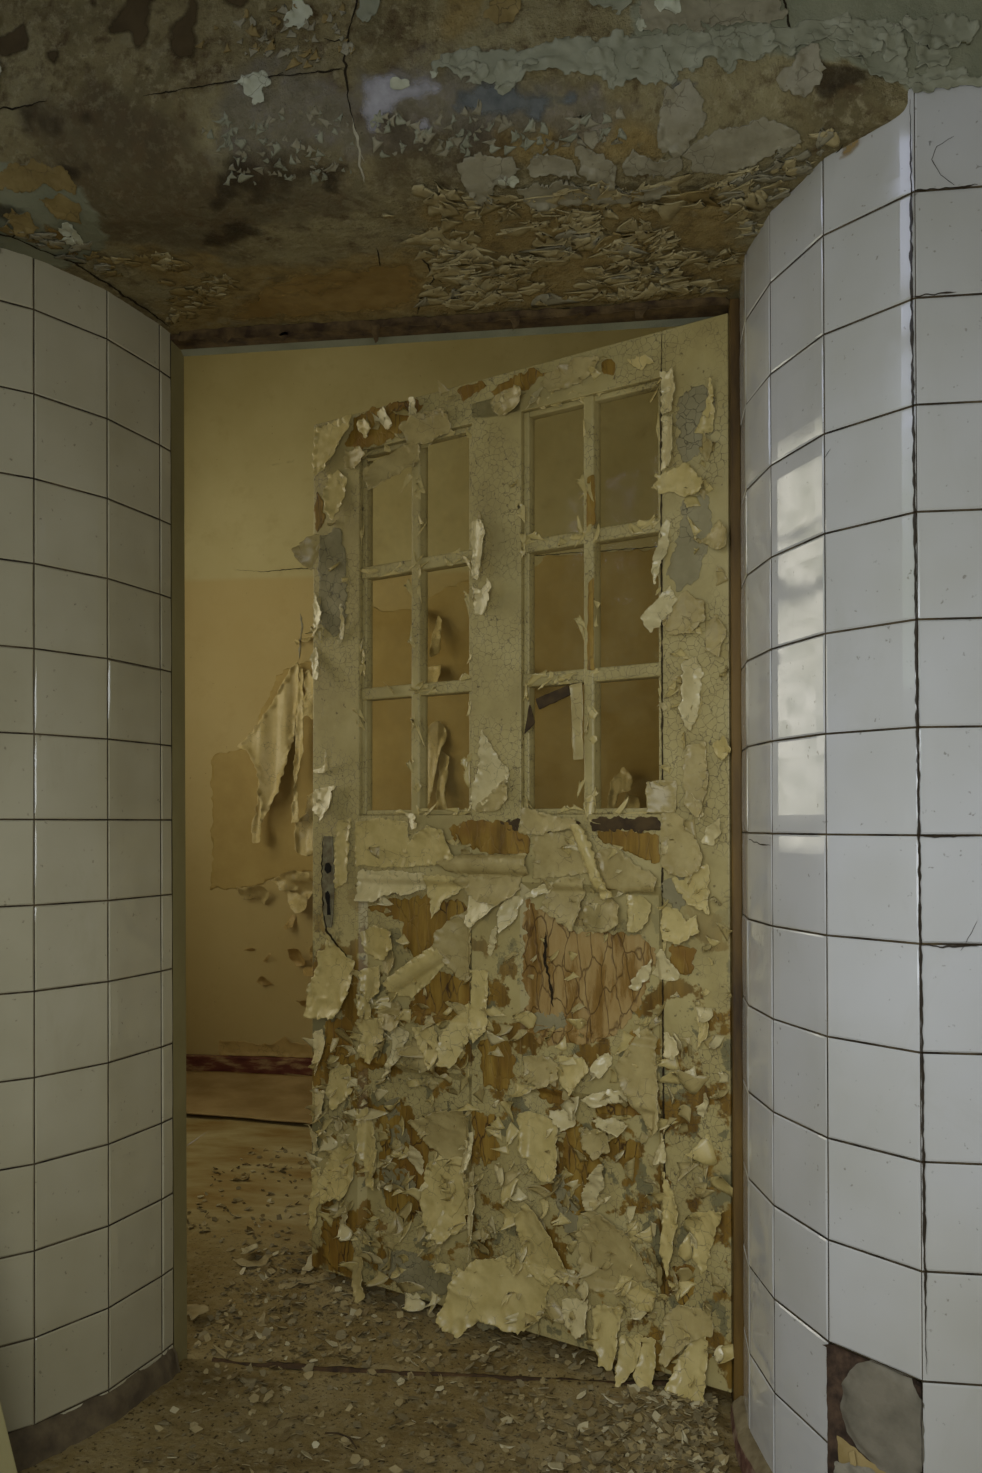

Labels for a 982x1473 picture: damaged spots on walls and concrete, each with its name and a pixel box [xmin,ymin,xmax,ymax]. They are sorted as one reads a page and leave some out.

peeling [0,158,241,325]
damp [109,0,153,48]
damp [169,0,198,58]
damp [215,159,284,206]
crack [144,0,365,181]
peeling [195,0,380,186]
peeling [370,0,980,313]
peeling [457,367,547,416]
peeling [291,399,451,570]
flaking render [210,548,727,1338]
peeling [591,1172,724,1403]
peeling [823,1344,925,1473]